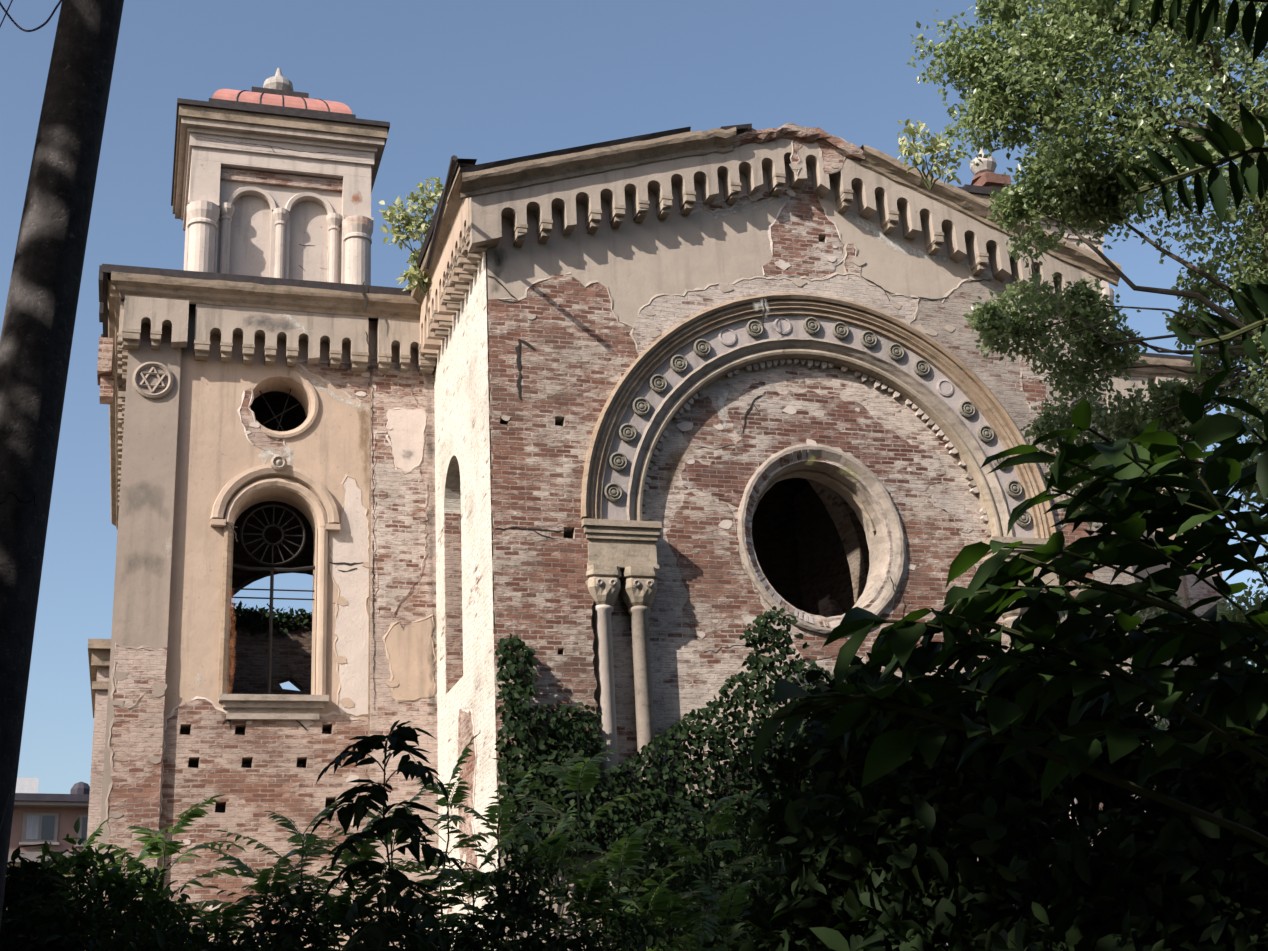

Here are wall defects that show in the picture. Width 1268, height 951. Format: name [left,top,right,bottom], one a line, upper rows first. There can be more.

peeling [103,359,437,931]
peeling [457,706,479,904]
peeling [487,135,1134,859]
crack [861,276,992,301]